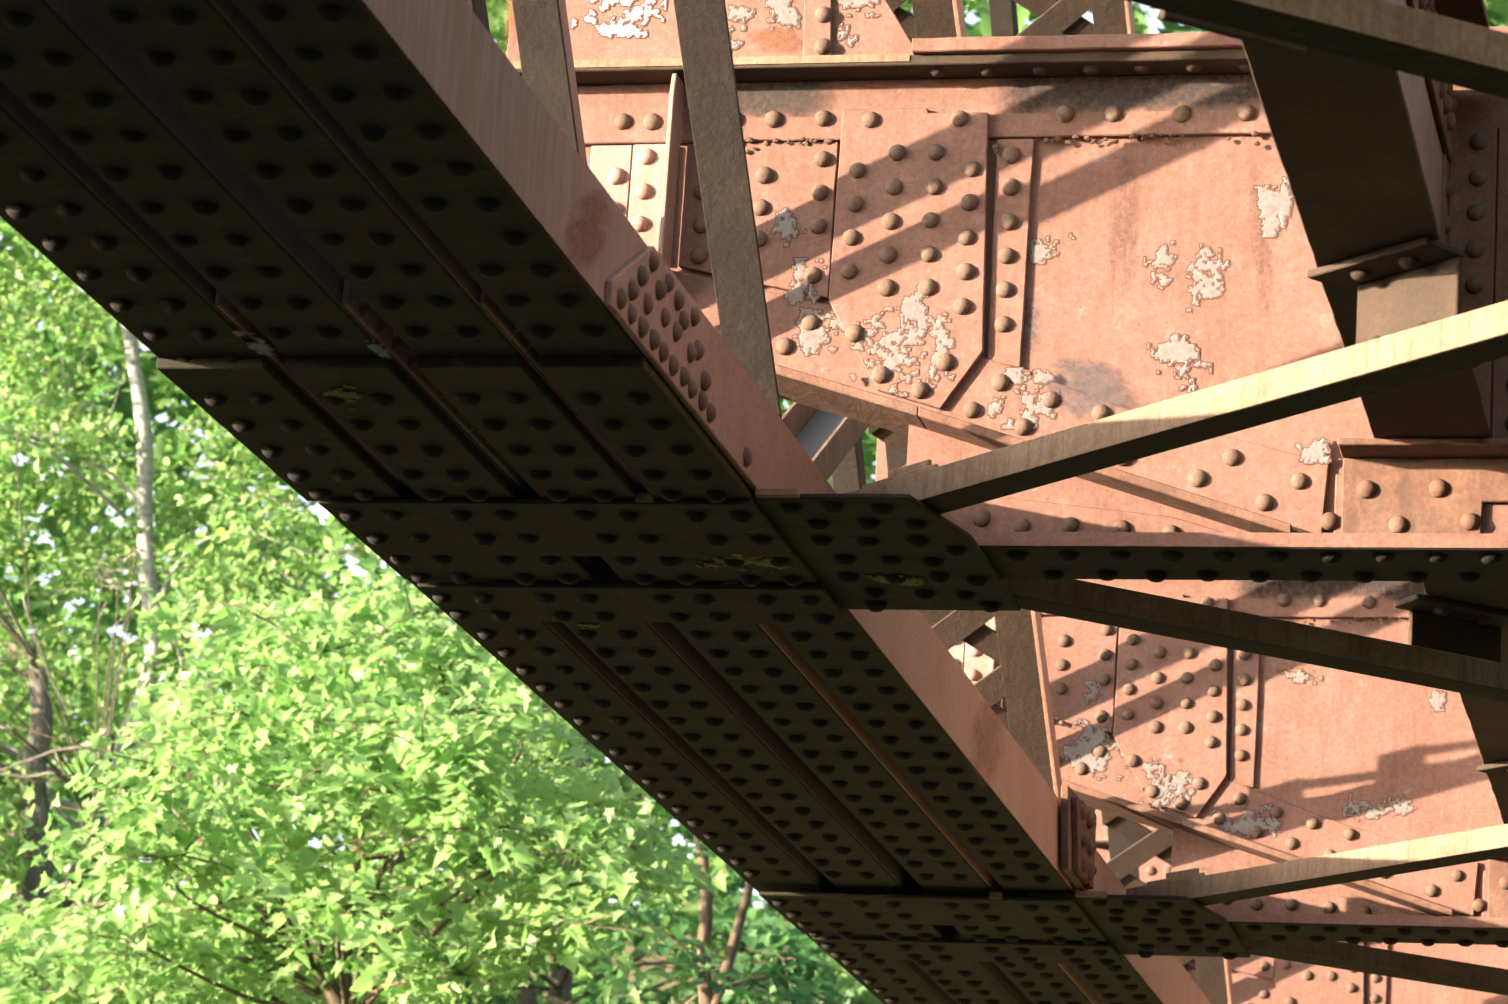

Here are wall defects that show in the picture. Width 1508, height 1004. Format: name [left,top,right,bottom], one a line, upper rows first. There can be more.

peeling [571,0,668,39]
peeling [727,0,802,50]
peeling [835,0,880,48]
peeling [1253,176,1293,239]
peeling [771,207,956,397]
peeling [1028,232,1076,265]
peeling [1142,240,1230,312]
peeling [1146,333,1213,393]
peeling [987,367,1060,430]
peeling [1058,680,1196,809]
peeling [1212,802,1283,839]
peeling [1342,792,1417,822]